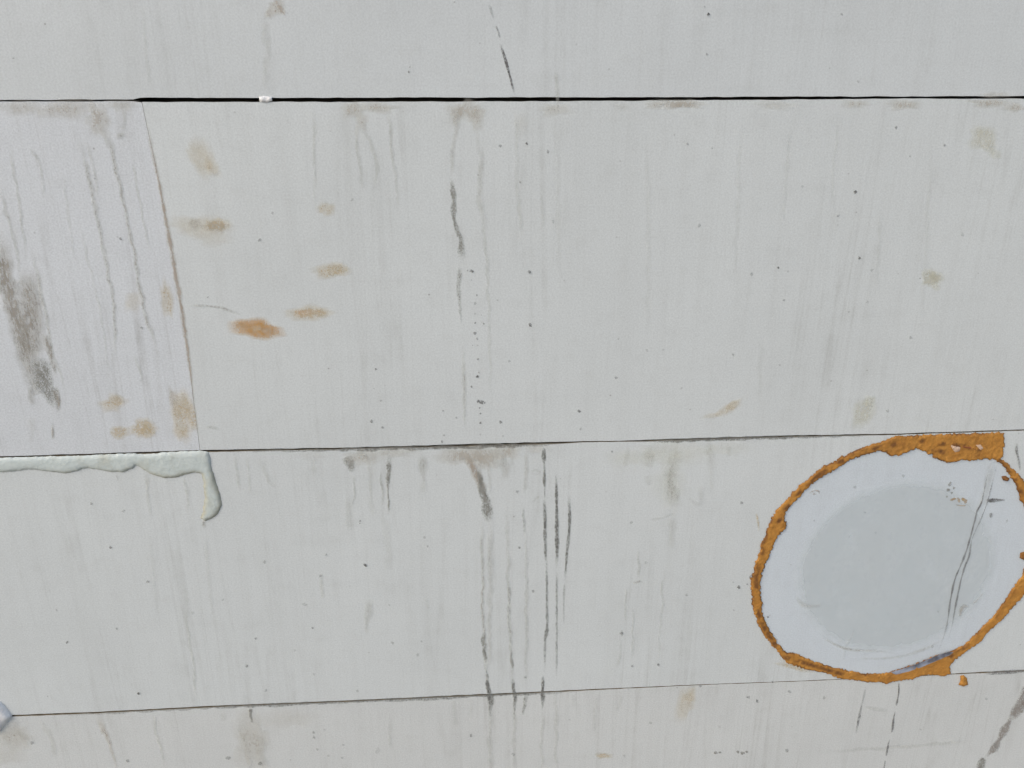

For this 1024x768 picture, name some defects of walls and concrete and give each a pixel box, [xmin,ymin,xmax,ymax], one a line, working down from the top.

leakage [0,259,60,406]
rust [236,320,279,338]
leakage [467,458,492,517]
leakage [542,452,571,571]
crack [946,483,992,629]